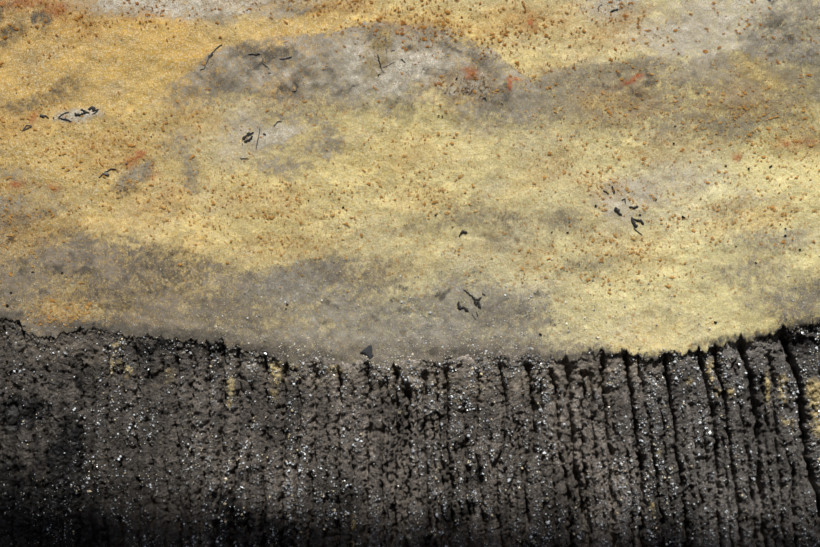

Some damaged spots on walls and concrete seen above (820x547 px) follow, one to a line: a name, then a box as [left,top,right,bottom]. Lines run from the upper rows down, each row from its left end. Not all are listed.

rust [0,0,221,63]
rust [0,54,502,282]
leakage [0,168,658,396]
peeling [457,289,485,320]
leakage [163,0,820,180]
rust [236,0,820,303]